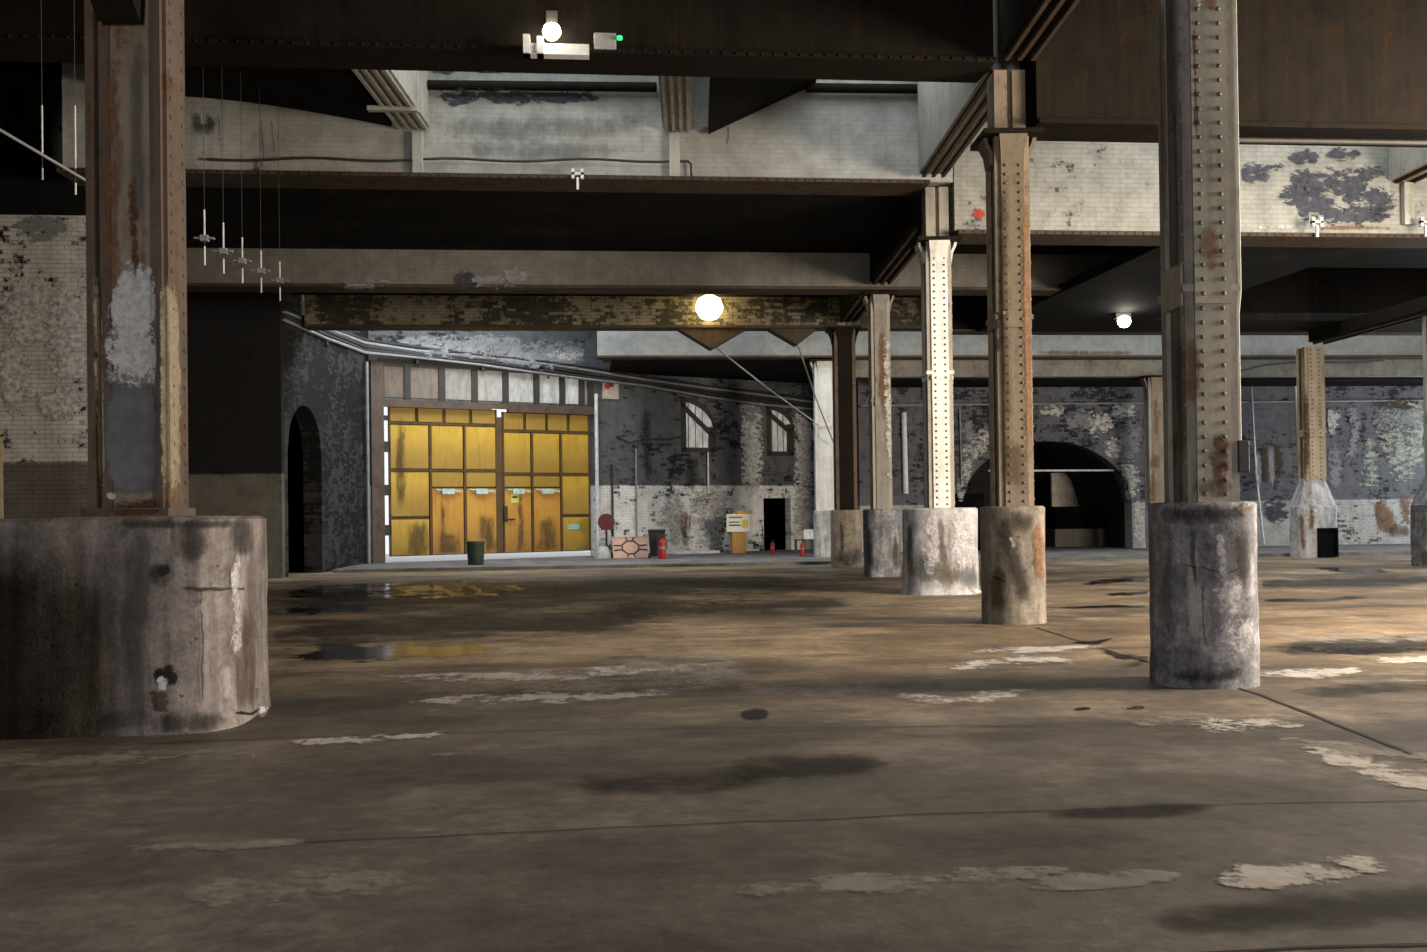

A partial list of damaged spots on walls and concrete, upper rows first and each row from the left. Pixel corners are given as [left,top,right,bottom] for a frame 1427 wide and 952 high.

peeling [0,68,63,169]
peeling [1242,147,1397,228]
peeling [0,214,181,519]
corrosion [1177,344,1200,450]
corrosion [1199,435,1230,493]
peeling [1328,398,1425,490]